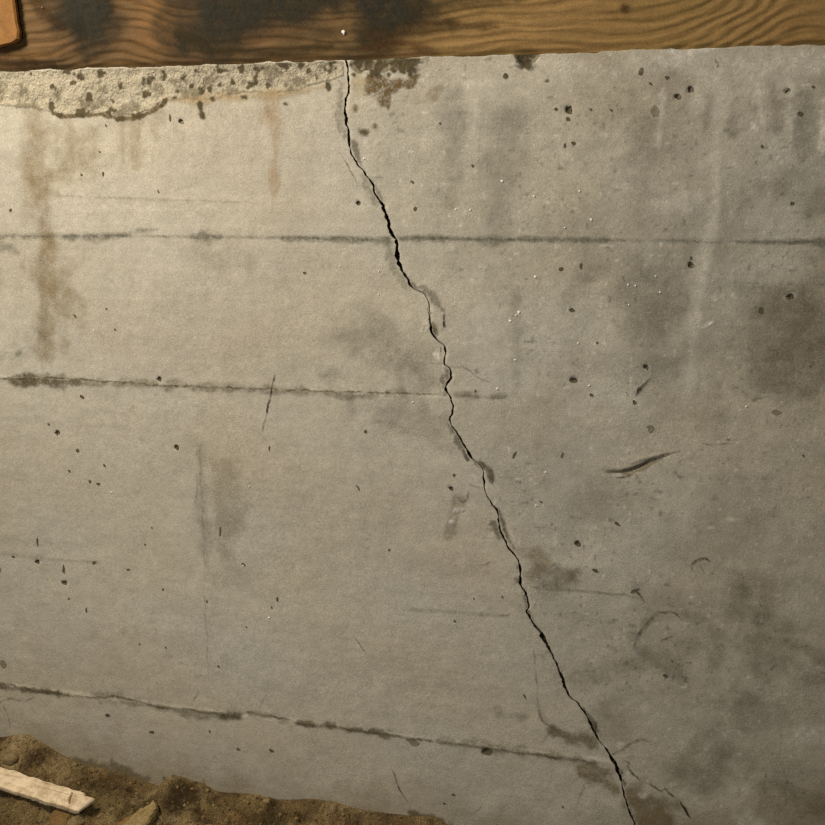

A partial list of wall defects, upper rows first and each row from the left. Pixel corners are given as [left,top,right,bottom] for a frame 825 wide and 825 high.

spalling [0,58,423,121]
crack [339,60,691,825]